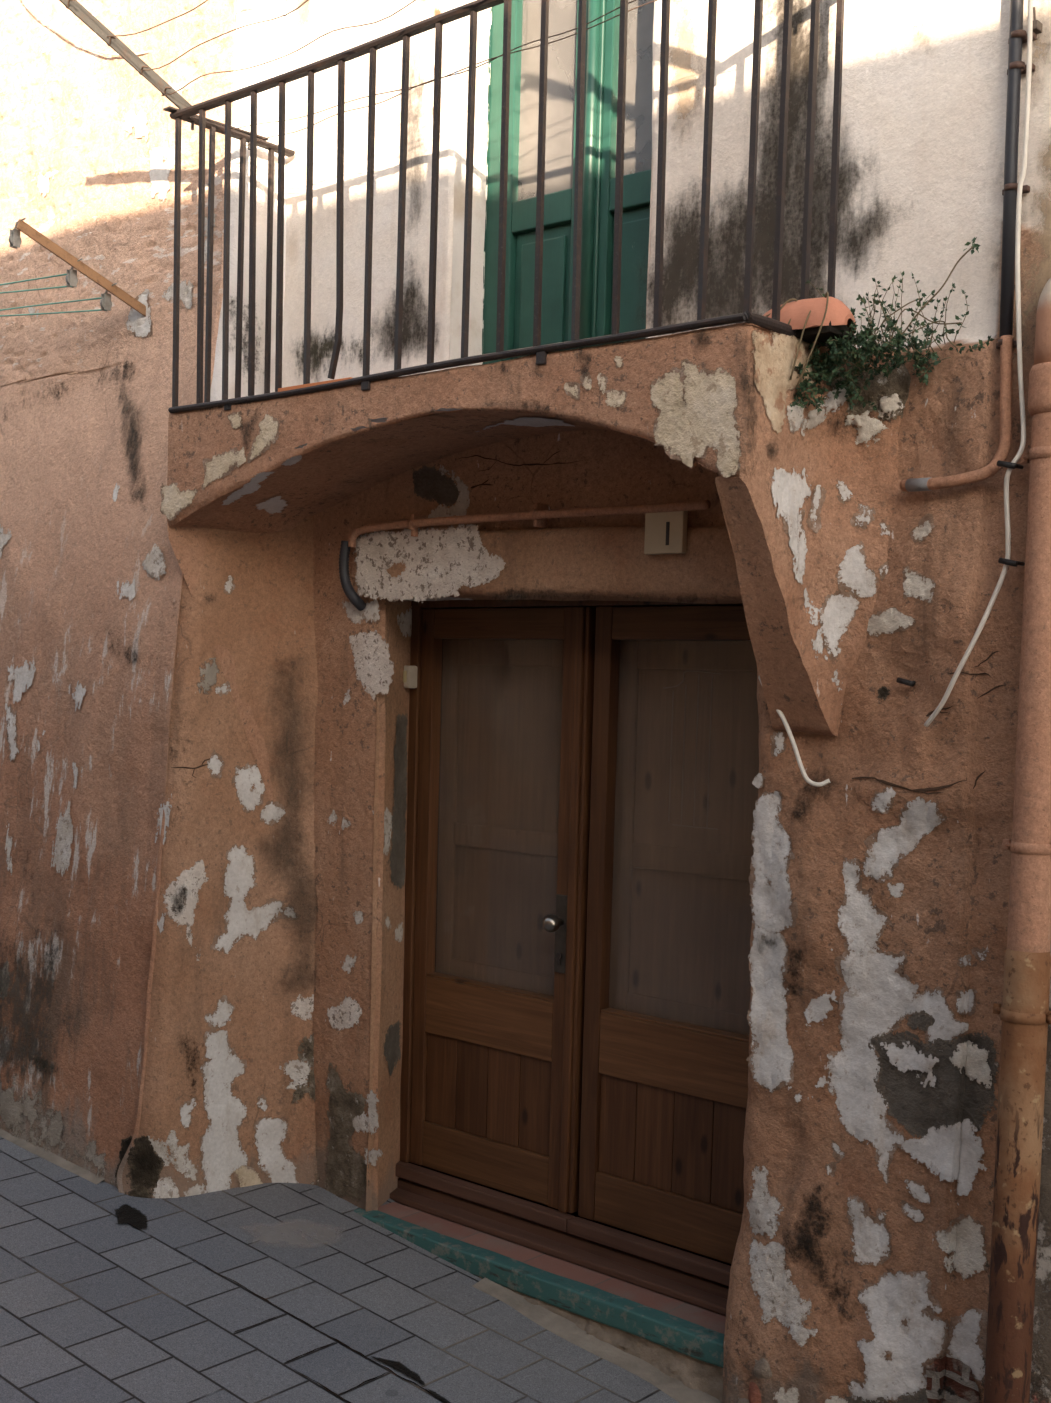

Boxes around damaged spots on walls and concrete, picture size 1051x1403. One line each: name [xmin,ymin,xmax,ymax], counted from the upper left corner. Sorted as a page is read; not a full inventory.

water stain [647,0,888,343]
water stain [1014,190,1051,331]
peeling [649,359,742,478]
peeling [751,330,911,446]
peeling [342,463,506,705]
peeling [771,468,936,705]
peeling [5,660,36,762]
peeling [207,750,286,826]
peeling [157,844,295,961]
peeling [0,994,383,1202]
peeling [746,773,1001,1403]
peeling [1030,1008,1051,1403]